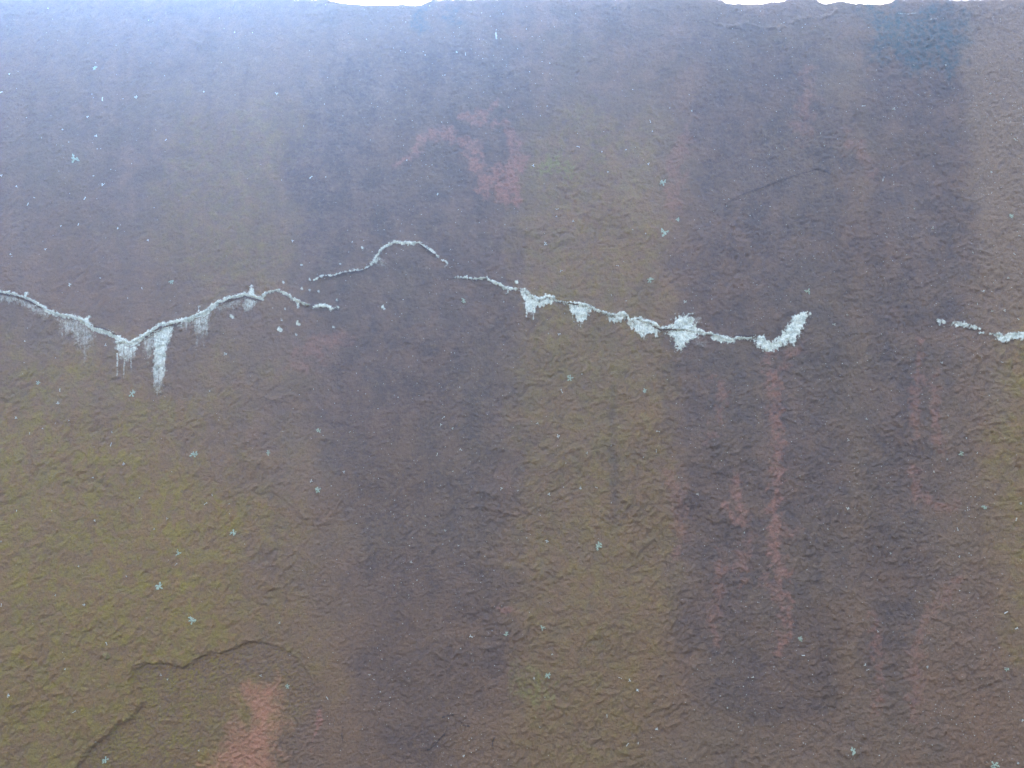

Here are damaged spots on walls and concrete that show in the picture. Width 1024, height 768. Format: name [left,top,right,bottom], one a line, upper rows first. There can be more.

crack [0,239,812,400]
rust [755,337,809,663]
leakage [665,3,995,753]
crack [934,318,1024,345]